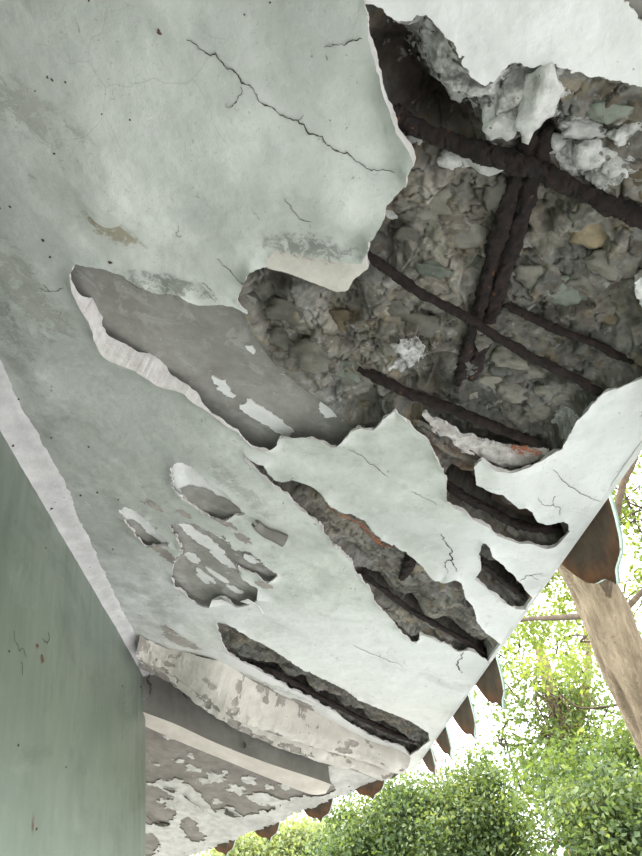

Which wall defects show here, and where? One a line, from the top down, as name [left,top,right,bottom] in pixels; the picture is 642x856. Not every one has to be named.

crack [187,40,394,173]
spalling [71,0,642,545]
peeling [160,623,208,659]
peeling [120,463,288,613]
spalling [217,623,429,754]
spalling [247,457,498,660]
spalling [476,544,530,607]